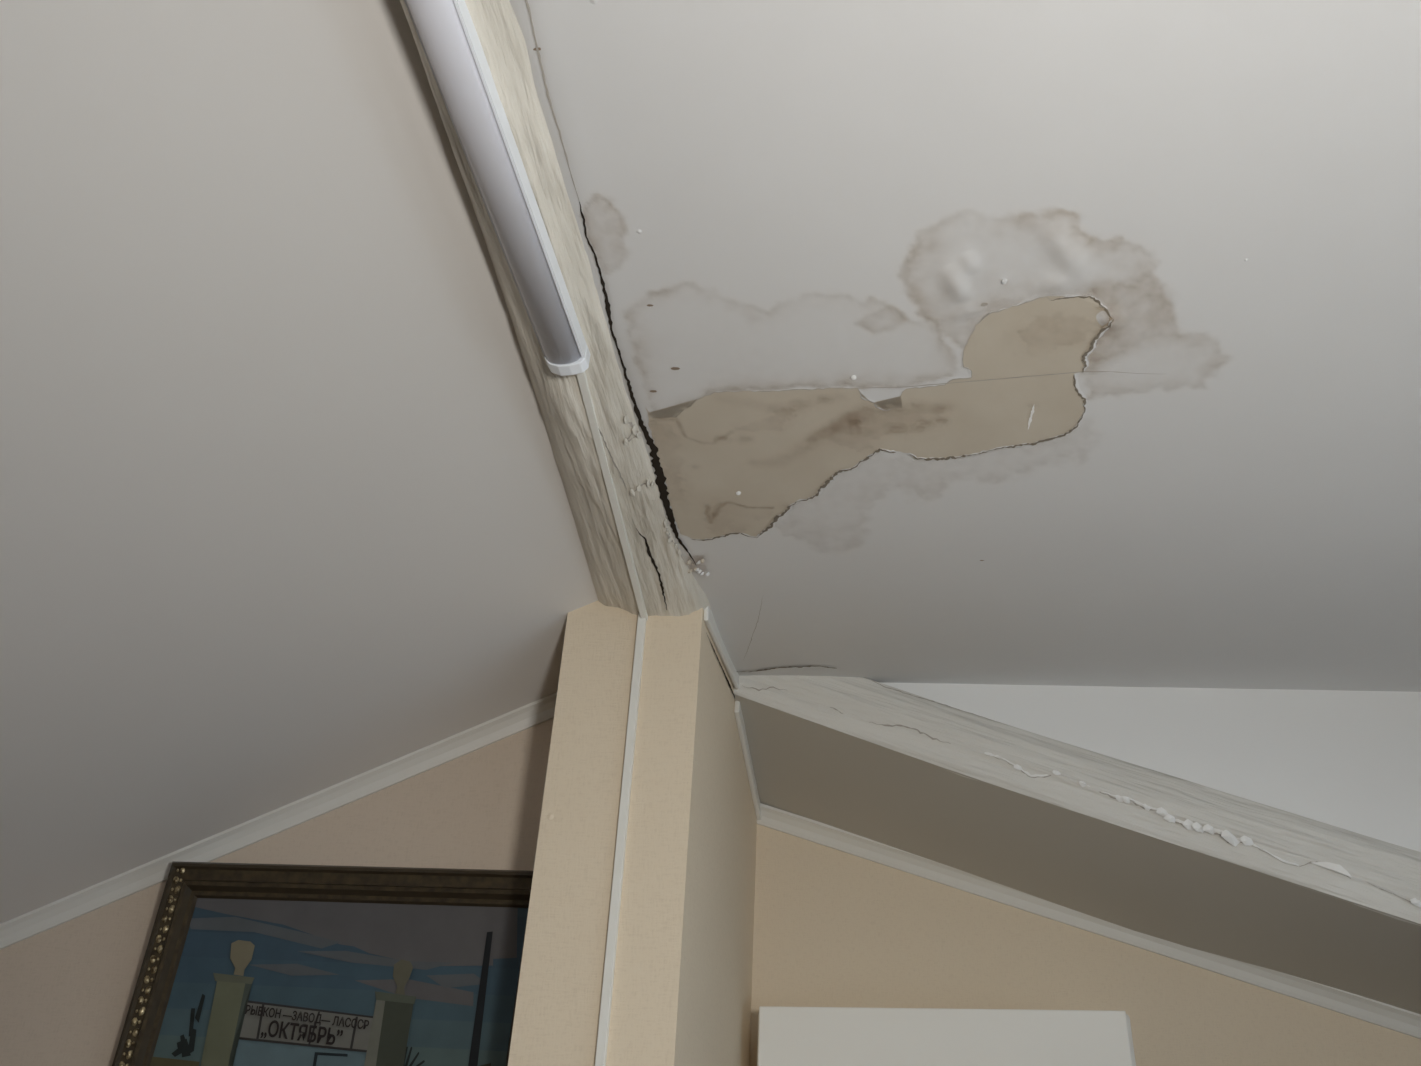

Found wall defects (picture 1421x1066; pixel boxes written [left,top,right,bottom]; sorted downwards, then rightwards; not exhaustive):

crack [598,428,627,490]
peeling [623,293,1117,578]
crack [637,530,667,610]